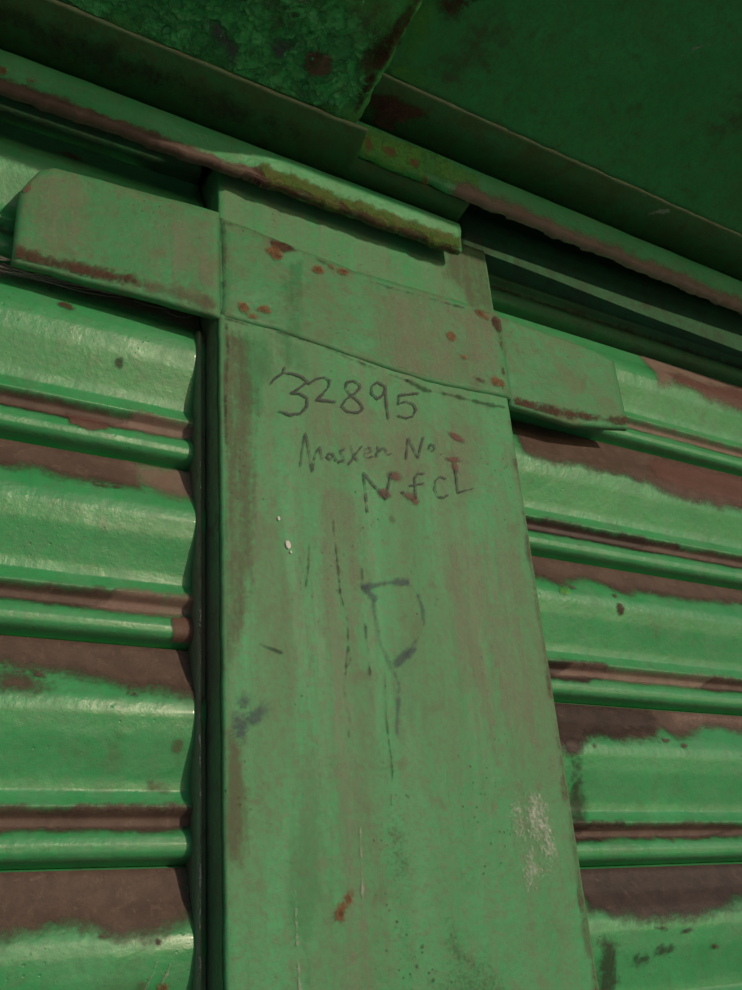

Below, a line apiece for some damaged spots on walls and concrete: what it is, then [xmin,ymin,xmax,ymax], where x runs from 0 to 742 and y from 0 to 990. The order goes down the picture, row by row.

corrosion [0,66,461,255]
corrosion [16,246,138,285]
corrosion [266,240,293,259]
corrosion [476,310,502,332]
corrosion [515,397,628,424]
peeling [0,439,201,497]
peeling [511,420,742,509]
peeling [0,581,202,699]
peeling [554,703,742,755]
peeling [0,863,202,944]
corrosion [335,894,352,920]
peeling [580,864,742,932]